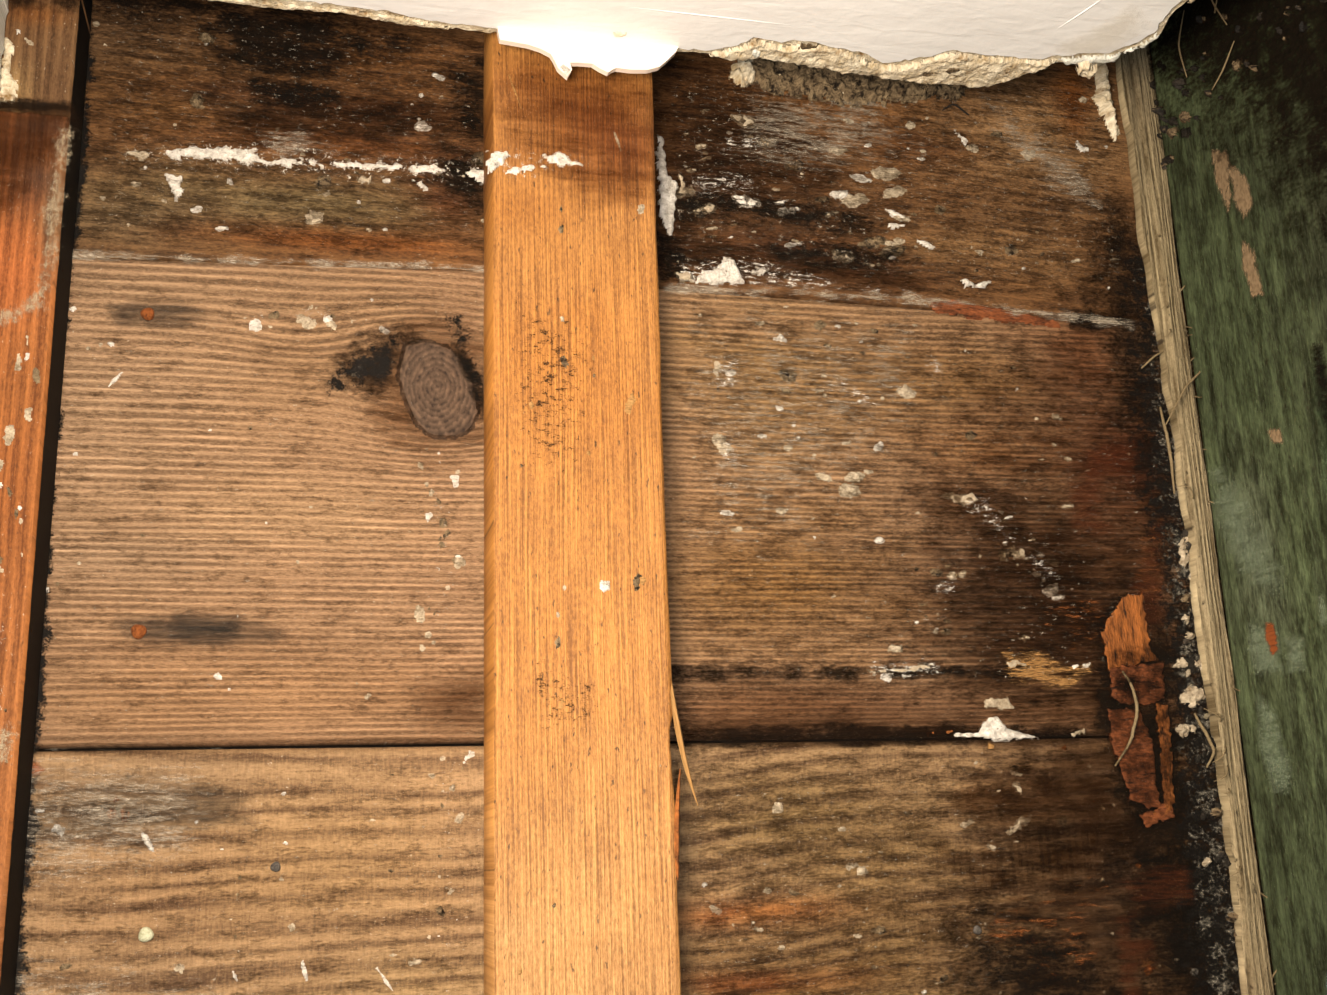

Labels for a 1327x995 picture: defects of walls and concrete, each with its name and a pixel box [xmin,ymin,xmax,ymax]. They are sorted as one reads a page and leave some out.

flaking render [709,32,1160,88]
mould [1151,0,1327,188]
damp [166,58,583,215]
damp [654,134,896,281]
damp [445,315,484,393]
damp [0,0,419,995]
damp [1093,208,1241,995]
damp [671,664,1026,682]
damp [681,722,984,747]
damp [1010,725,1079,738]
damp [970,929,1117,995]